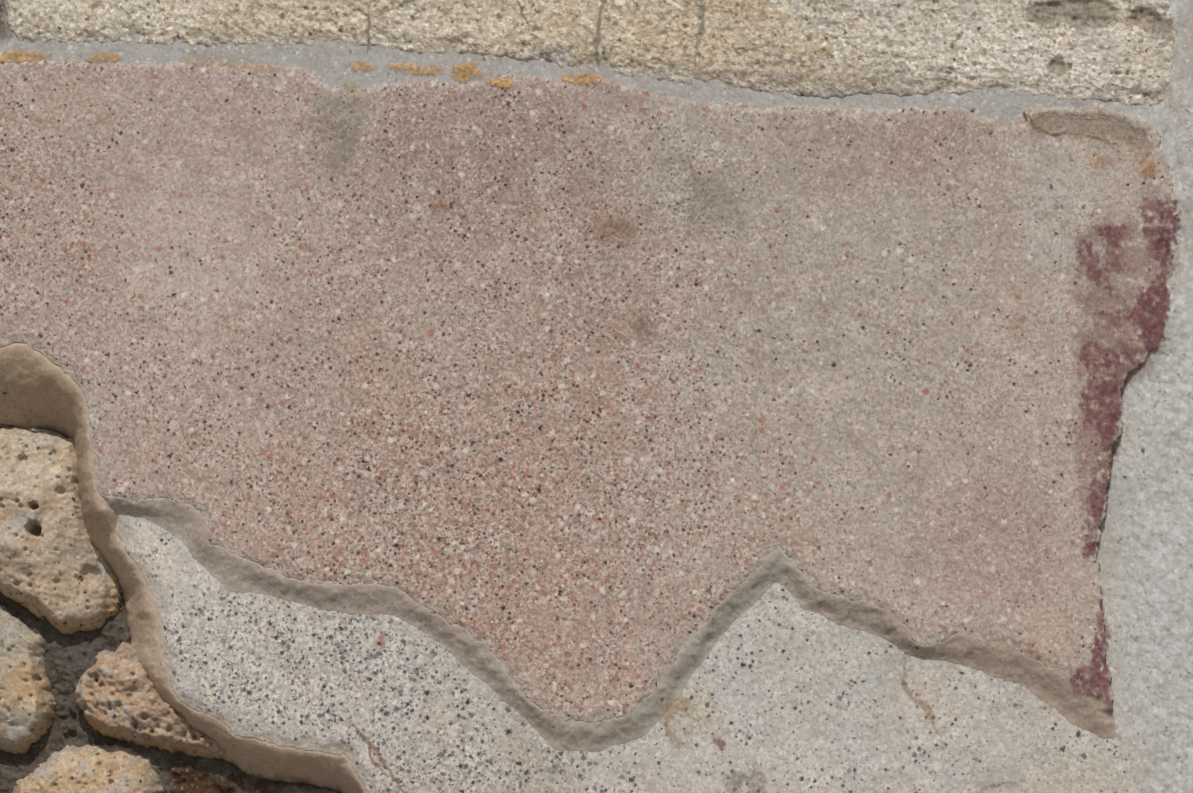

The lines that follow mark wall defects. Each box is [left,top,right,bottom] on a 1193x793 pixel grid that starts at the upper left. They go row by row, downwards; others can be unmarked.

crack [362,0,411,50]
crack [593,0,605,64]
crack [694,0,705,67]
peeling [1077,224,1126,298]
peeling [1127,196,1180,353]
peeling [0,339,1142,793]